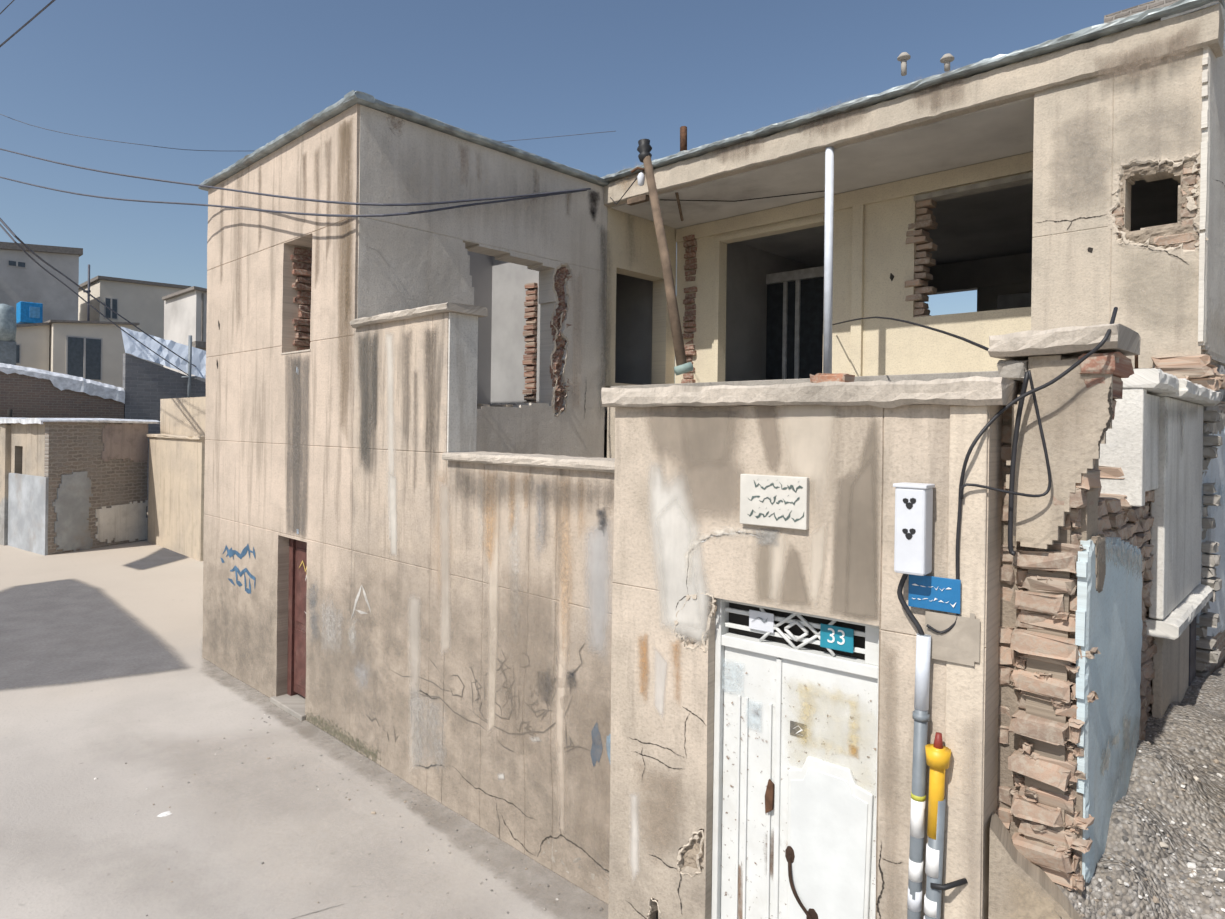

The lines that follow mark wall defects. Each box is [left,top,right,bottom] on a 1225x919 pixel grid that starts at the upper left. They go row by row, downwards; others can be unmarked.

spalling [1104,151,1209,256]
flaking render [290,248,312,351]
damp [316,126,416,555]
spalling [550,263,577,417]
damp [287,357,309,534]
crack [411,688,437,724]
crack [631,706,705,784]
crack [414,764,609,872]
crack [651,855,682,914]
spalling [676,830,704,877]